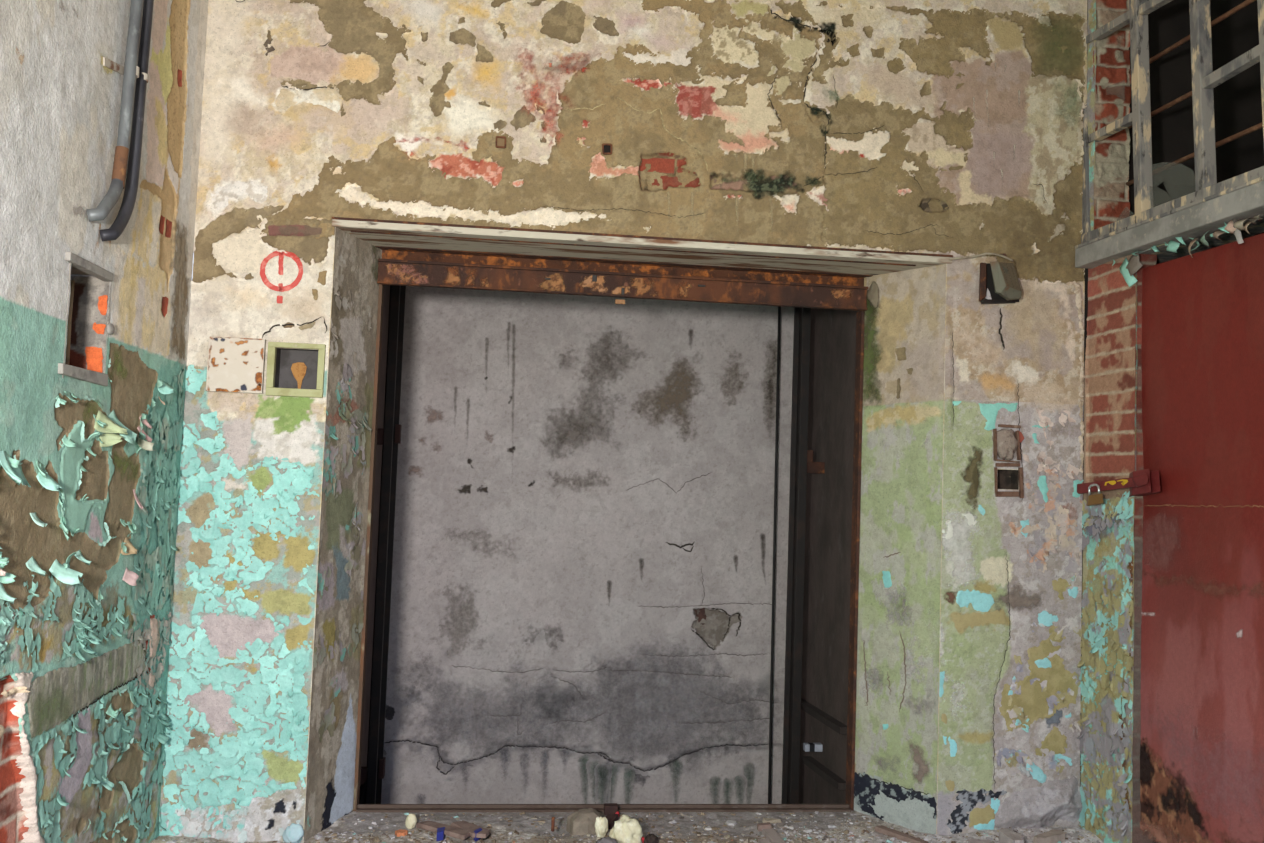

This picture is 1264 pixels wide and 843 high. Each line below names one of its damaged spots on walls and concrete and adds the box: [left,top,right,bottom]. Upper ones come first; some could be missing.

rust [332,217,953,299]
peeling [1151,213,1264,258]
crack [998,308,1006,350]
water stain [547,332,626,452]
flaking render [191,0,1143,837]
water stain [639,362,697,434]
peeling [0,318,372,843]
crack [384,542,772,775]
water stain [431,650,759,779]
water stain [580,757,645,804]
water stain [725,767,751,803]
rust [1119,653,1229,843]